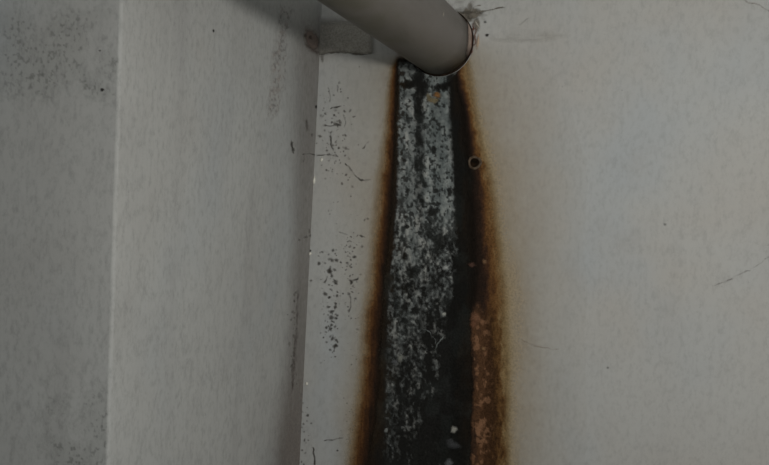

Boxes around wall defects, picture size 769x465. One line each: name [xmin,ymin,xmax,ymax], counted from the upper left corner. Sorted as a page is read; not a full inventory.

damp [318,245,358,357]
damp [349,58,523,465]